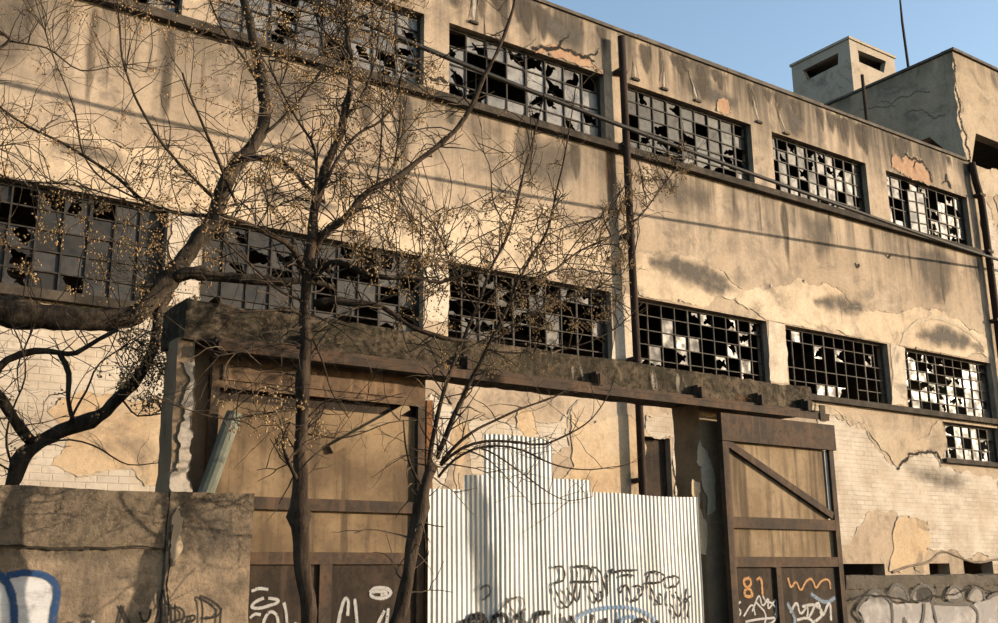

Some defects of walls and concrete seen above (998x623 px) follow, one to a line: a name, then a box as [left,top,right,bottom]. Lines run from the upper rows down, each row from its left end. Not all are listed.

water stain [161,29,176,112]
crack [859,57,971,160]
flaking render [0,116,222,259]
flaking render [225,171,994,406]
water stain [651,258,730,294]
water stain [781,204,789,256]
water stain [815,297,861,312]
crack [906,153,952,189]
flaking render [0,315,166,492]
flaking render [815,404,998,573]
crack [897,450,941,470]
crack [0,525,173,623]